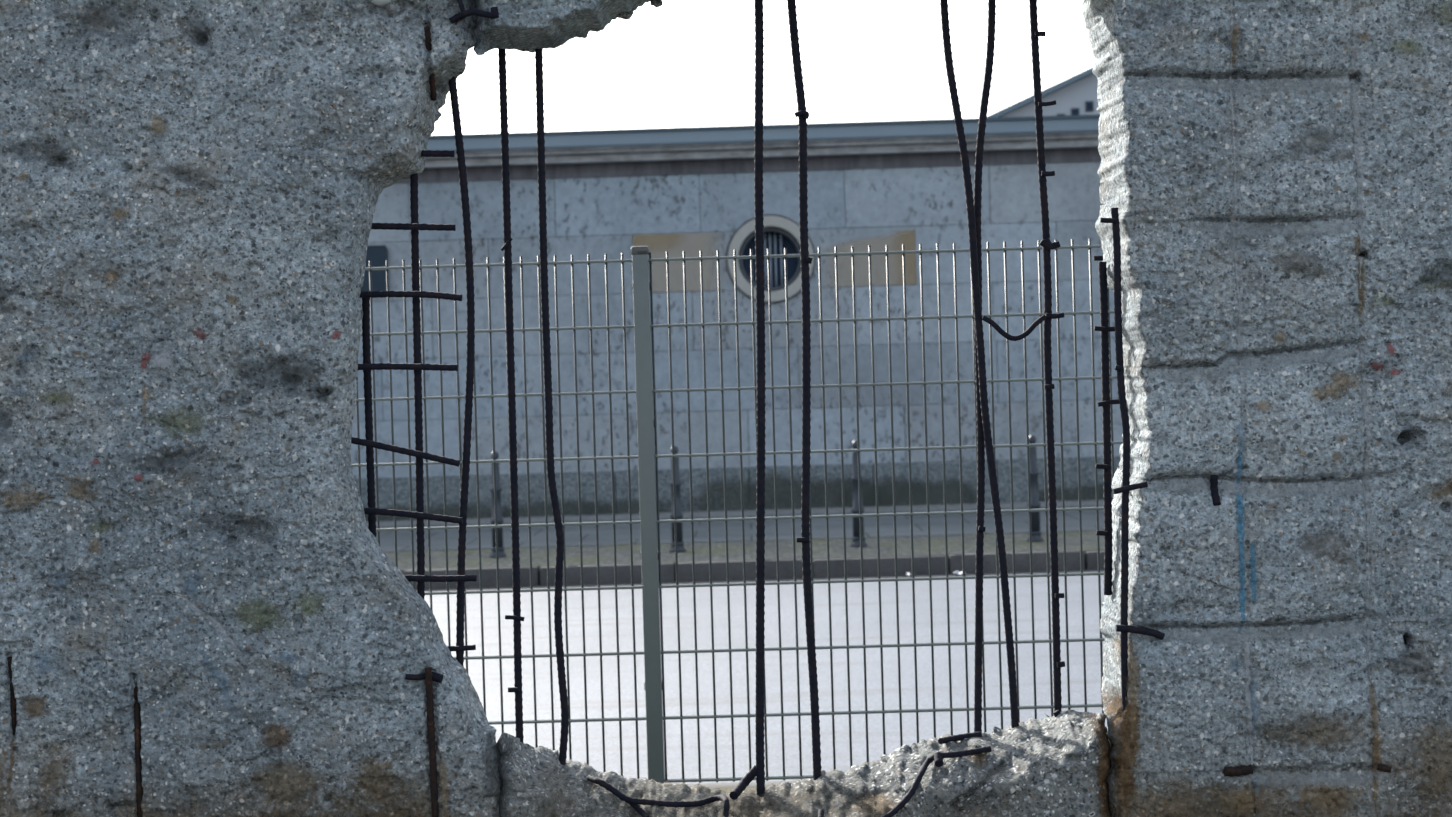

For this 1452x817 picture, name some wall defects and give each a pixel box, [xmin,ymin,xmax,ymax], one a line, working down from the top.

corrosion [24,697,45,717]
corrosion [113,725,450,817]
spalling [351,73,477,667]
spalling [405,667,443,817]
spalling [498,49,525,743]
spalling [535,47,569,765]
spalling [587,0,766,817]
spalling [787,0,822,780]
spalling [882,0,1019,817]
spalling [1029,0,1065,717]
spalling [1093,208,1165,714]
corrosion [1089,636,1452,817]